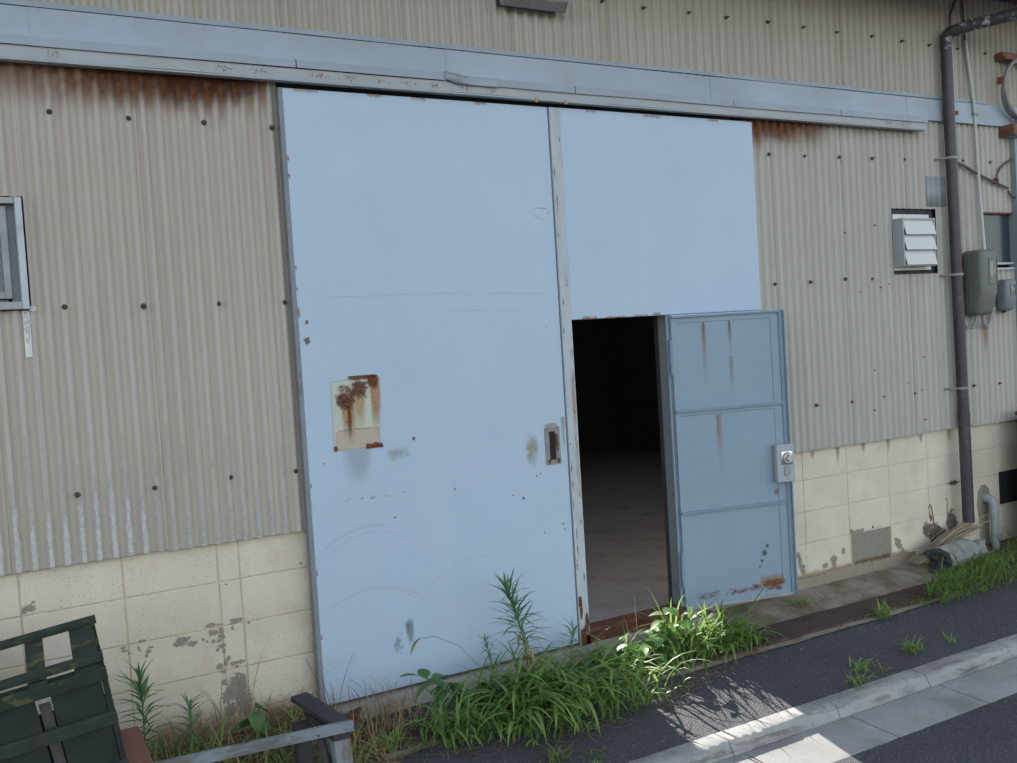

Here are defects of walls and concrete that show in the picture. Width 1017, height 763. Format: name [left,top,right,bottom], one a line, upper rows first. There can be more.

rust [0,52,263,98]
rust [709,116,811,139]
peeling [796,526,916,590]
rust [735,578,784,592]
peeling [173,617,253,717]